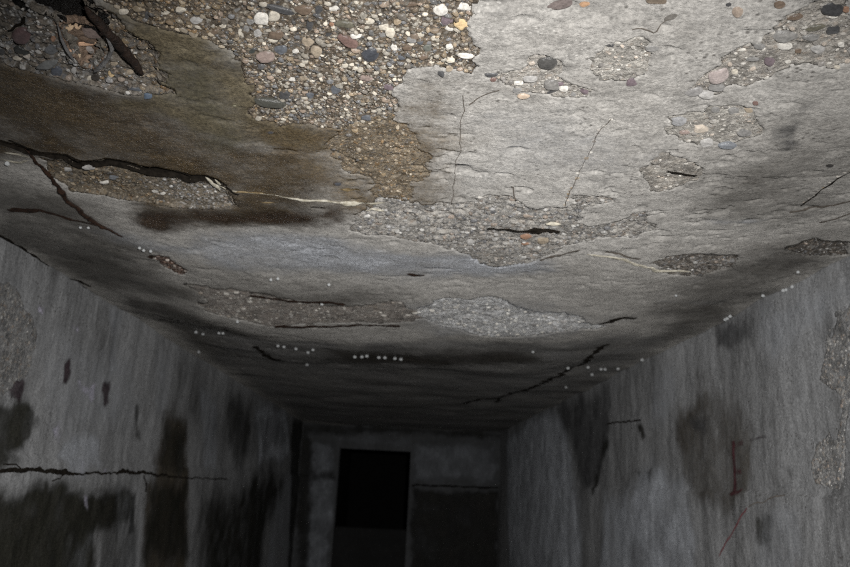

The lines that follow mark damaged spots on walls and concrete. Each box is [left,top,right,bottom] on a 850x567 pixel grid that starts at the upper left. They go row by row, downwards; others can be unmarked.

crack [0,140,239,195]
water stain [0,6,387,231]
spalling [0,0,656,267]
crack [451,90,499,205]
spalling [639,152,703,192]
crack [790,171,850,223]
spalling [786,238,848,256]
spalling [154,255,605,337]
water stain [0,380,33,467]
water stain [126,300,658,567]
crack [0,463,228,492]
water stain [0,481,134,567]